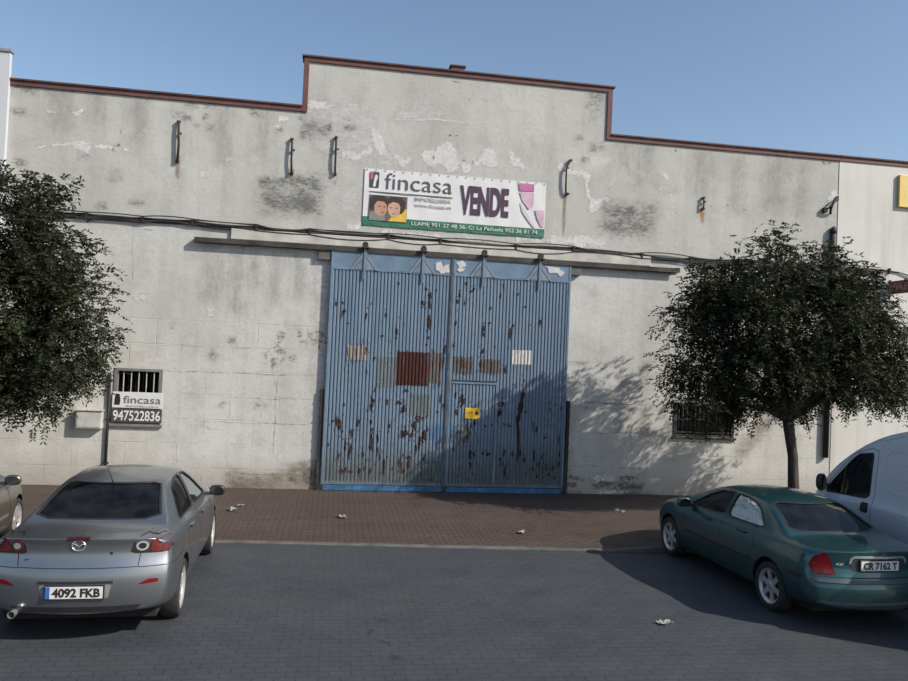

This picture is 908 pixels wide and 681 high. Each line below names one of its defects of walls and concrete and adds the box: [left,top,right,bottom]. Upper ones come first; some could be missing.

peeling [381,230,441,238]
peeling [306,100,530,231]
peeling [557,162,609,213]
corrosion [396,284,507,387]
spalling [331,387,432,481]
spalling [436,389,561,483]
corrosion [516,391,527,461]
peeling [567,468,647,494]